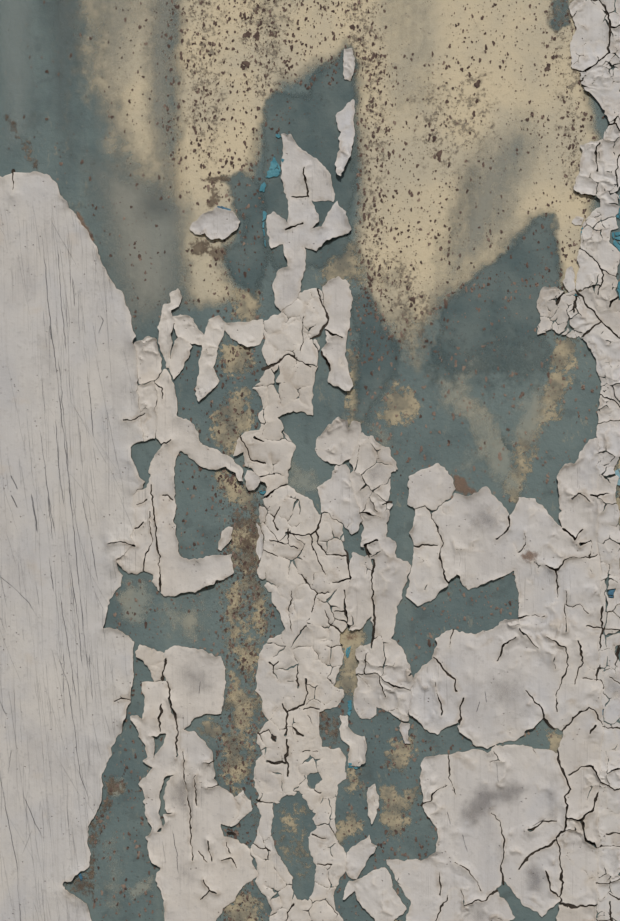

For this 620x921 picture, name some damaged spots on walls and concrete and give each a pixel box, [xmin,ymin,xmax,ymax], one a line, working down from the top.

crack [580,0,620,72]
rust [75,204,167,281]
peeling [85,0,620,642]
rust [114,0,605,499]
crack [556,248,620,339]
rust [66,740,163,921]
rust [113,454,276,846]
peeling [130,645,263,921]
rust [220,880,270,921]
crack [257,661,319,776]
crack [240,435,406,697]
crack [434,528,620,921]